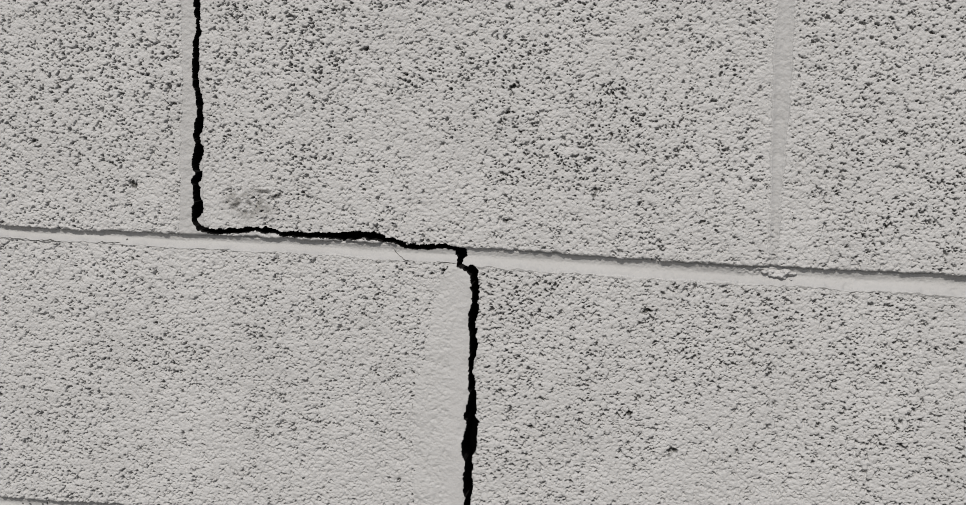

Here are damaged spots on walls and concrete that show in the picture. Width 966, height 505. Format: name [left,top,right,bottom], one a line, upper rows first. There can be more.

crack [191,0,480,505]